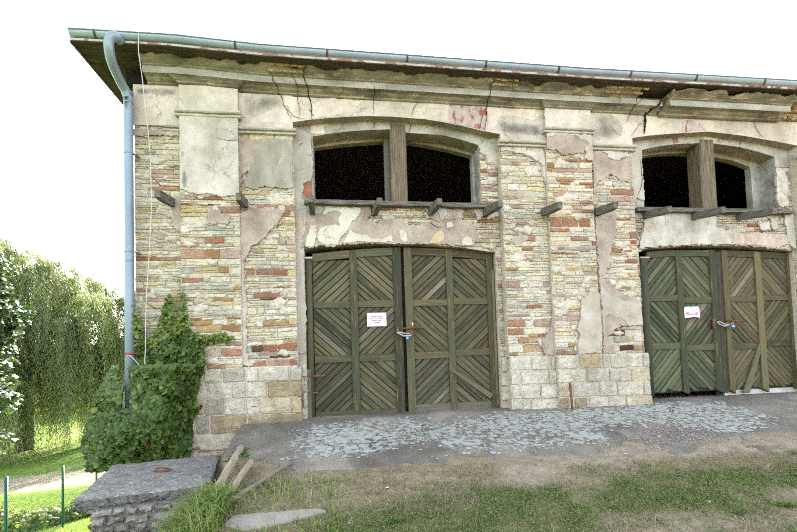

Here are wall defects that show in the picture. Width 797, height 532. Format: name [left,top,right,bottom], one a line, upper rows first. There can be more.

peeling [179,116,293,198]
crack [266,66,314,119]
crack [479,80,495,131]
peeling [448,105,632,193]
crack [614,94,663,135]
spalling [673,120,719,144]
spalling [780,100,797,122]
peeling [301,181,498,248]
peeling [638,170,796,250]
peeling [576,210,643,355]